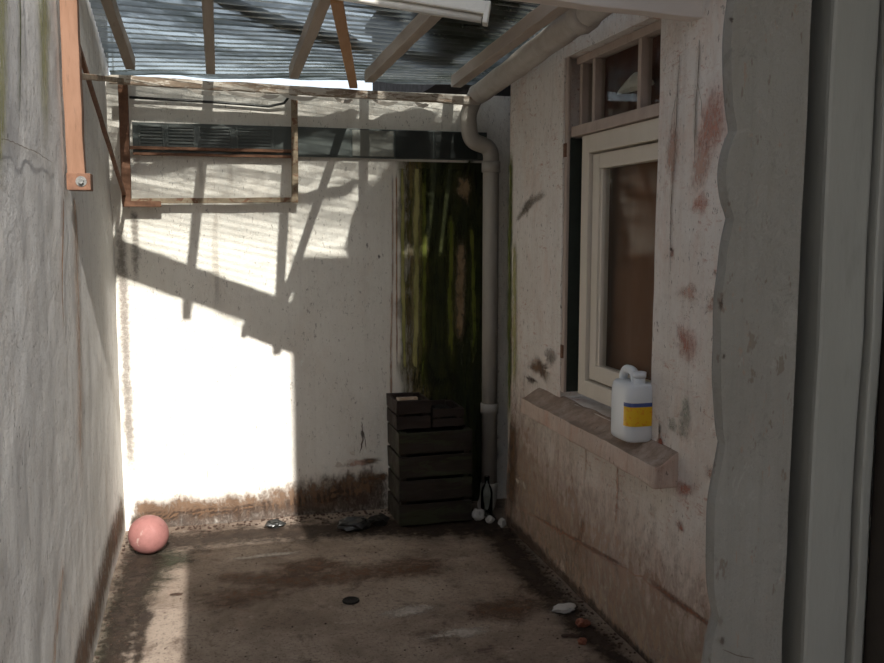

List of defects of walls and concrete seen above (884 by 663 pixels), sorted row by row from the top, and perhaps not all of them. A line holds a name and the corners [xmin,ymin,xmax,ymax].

leakage [118,214,138,458]
leakage [527,351,555,383]
leakage [75,405,709,663]